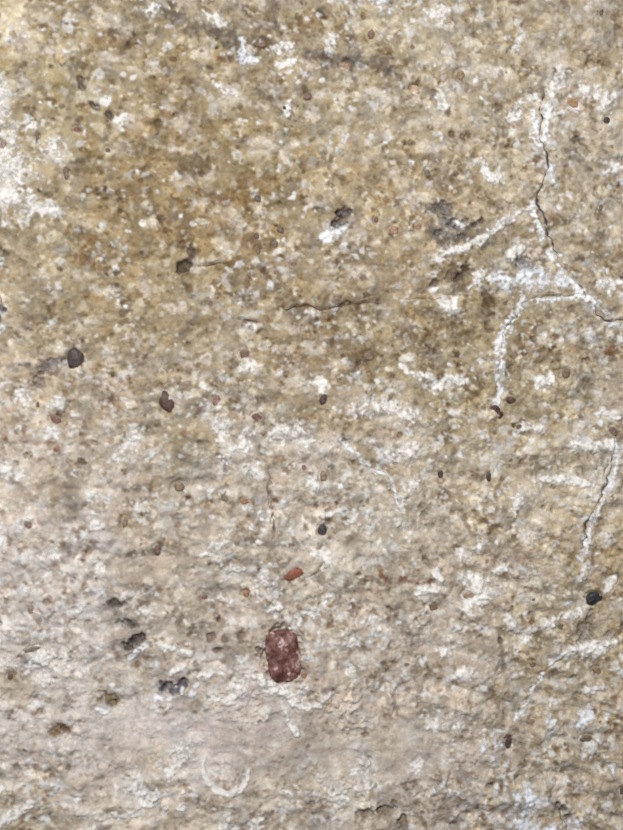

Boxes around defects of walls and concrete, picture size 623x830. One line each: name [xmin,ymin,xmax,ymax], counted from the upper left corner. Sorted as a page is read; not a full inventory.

crack [283,301,379,311]
crack [489,87,623,412]
crack [576,431,623,563]